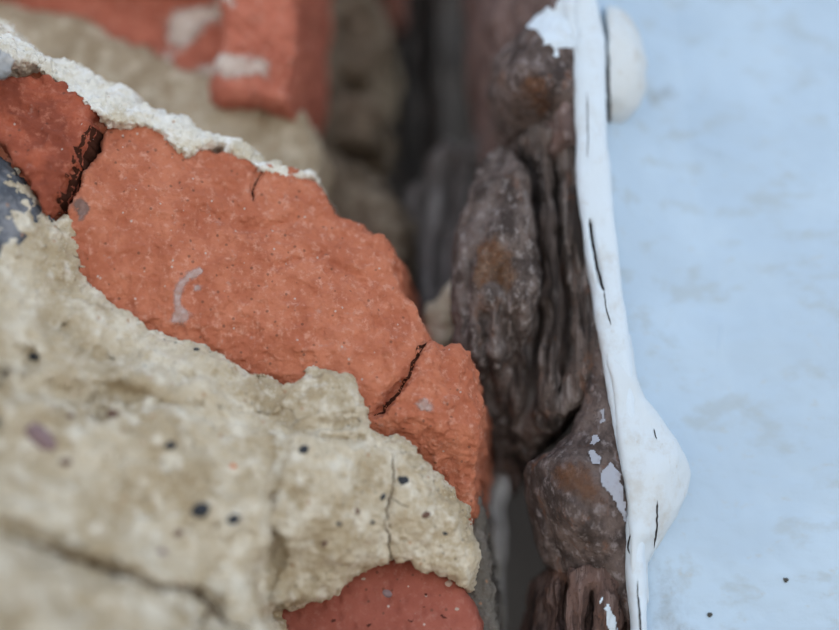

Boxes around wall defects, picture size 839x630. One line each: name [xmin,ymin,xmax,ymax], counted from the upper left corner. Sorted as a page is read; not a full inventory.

crack [57,125,107,214]
crack [374,343,427,416]
peeling [589,435,627,522]